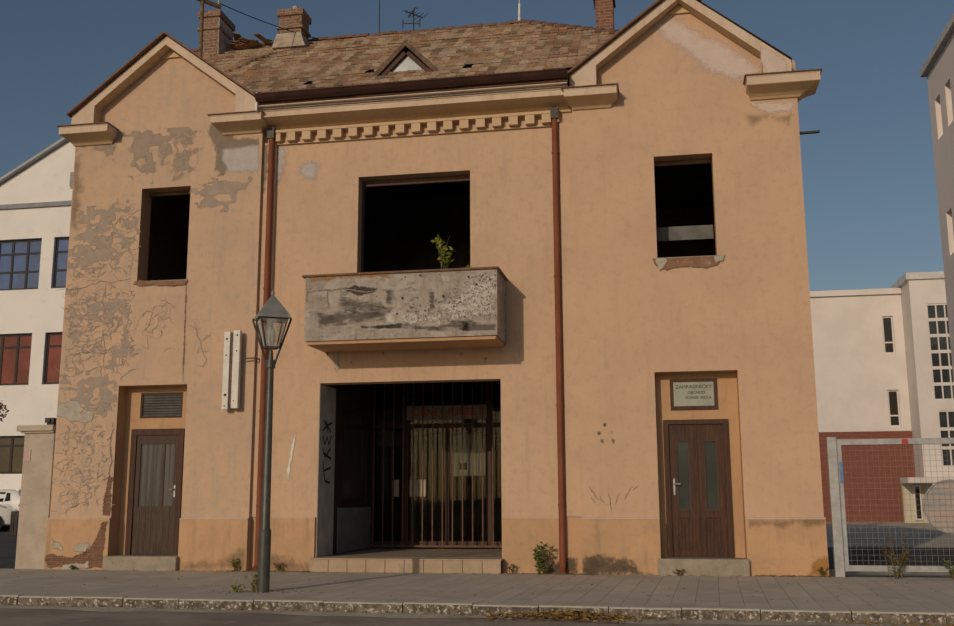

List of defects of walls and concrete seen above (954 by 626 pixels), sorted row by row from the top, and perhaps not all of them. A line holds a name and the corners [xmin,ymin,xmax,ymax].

peeling [83,127,198,181]
peeling [189,173,253,212]
crack [58,204,210,377]
peeling [346,272,496,325]
peeling [45,198,187,569]